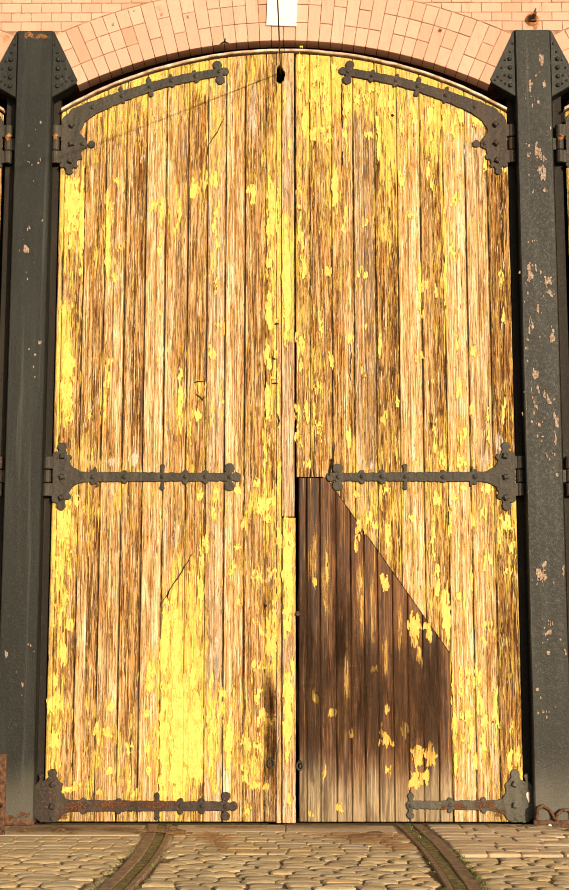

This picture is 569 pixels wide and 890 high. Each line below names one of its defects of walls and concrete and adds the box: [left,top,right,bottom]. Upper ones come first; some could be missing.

peeling [296,45,485,193]
peeling [234,139,308,673]
peeling [519,262,559,477]
peeling [46,590,102,796]
corrosion [60,801,183,819]
crack [160,553,193,606]
peeling [125,575,295,801]
peeling [354,511,392,553]
peeling [378,722,438,790]
peeling [407,610,432,666]
corrosion [438,799,506,816]
peeling [429,483,521,782]